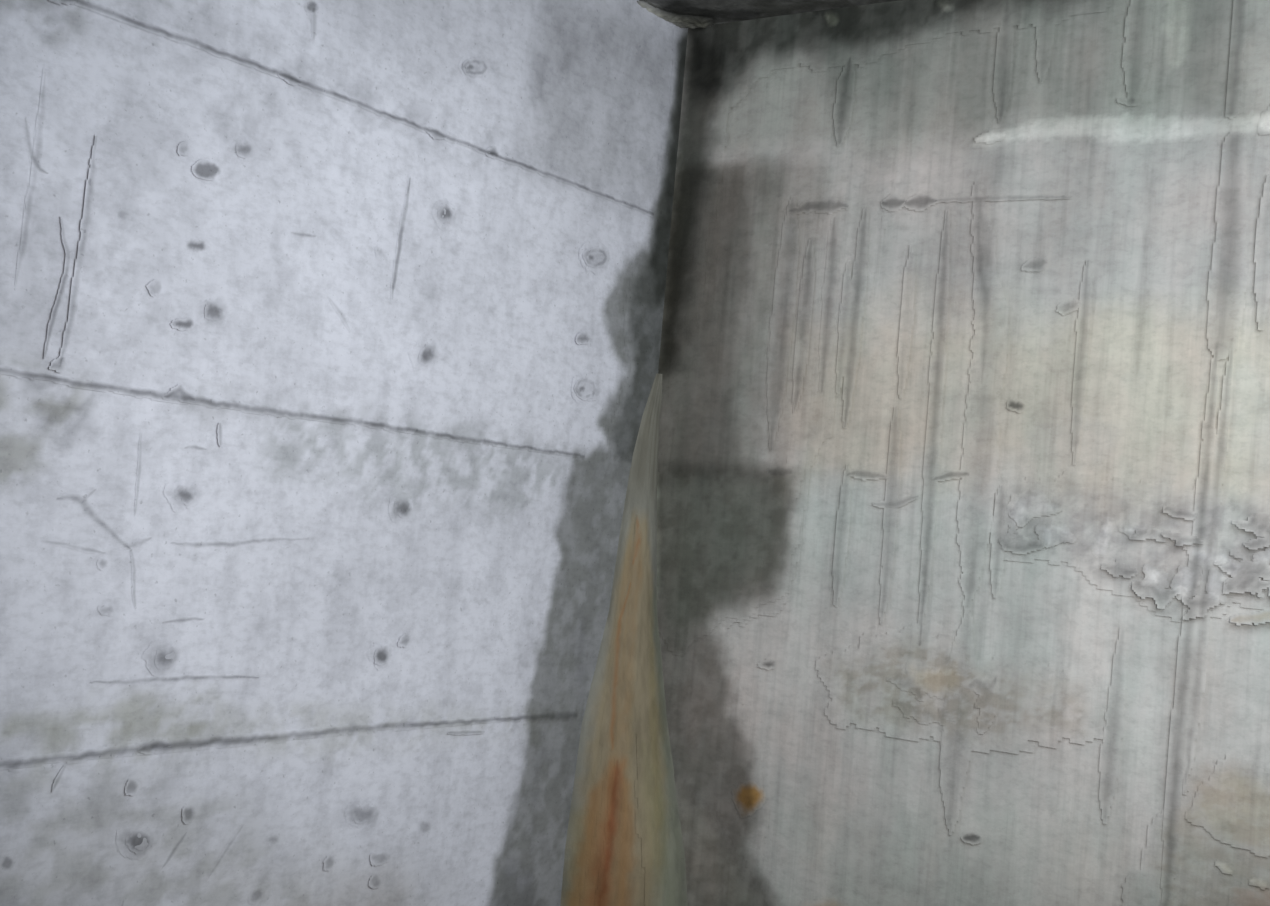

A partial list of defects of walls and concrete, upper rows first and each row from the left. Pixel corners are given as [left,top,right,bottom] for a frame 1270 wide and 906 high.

damp [1122,0,1197,99]
damp [1132,226,1152,381]
damp [484,0,1127,906]
corrosion [560,503,672,906]
corrosion [732,780,767,819]